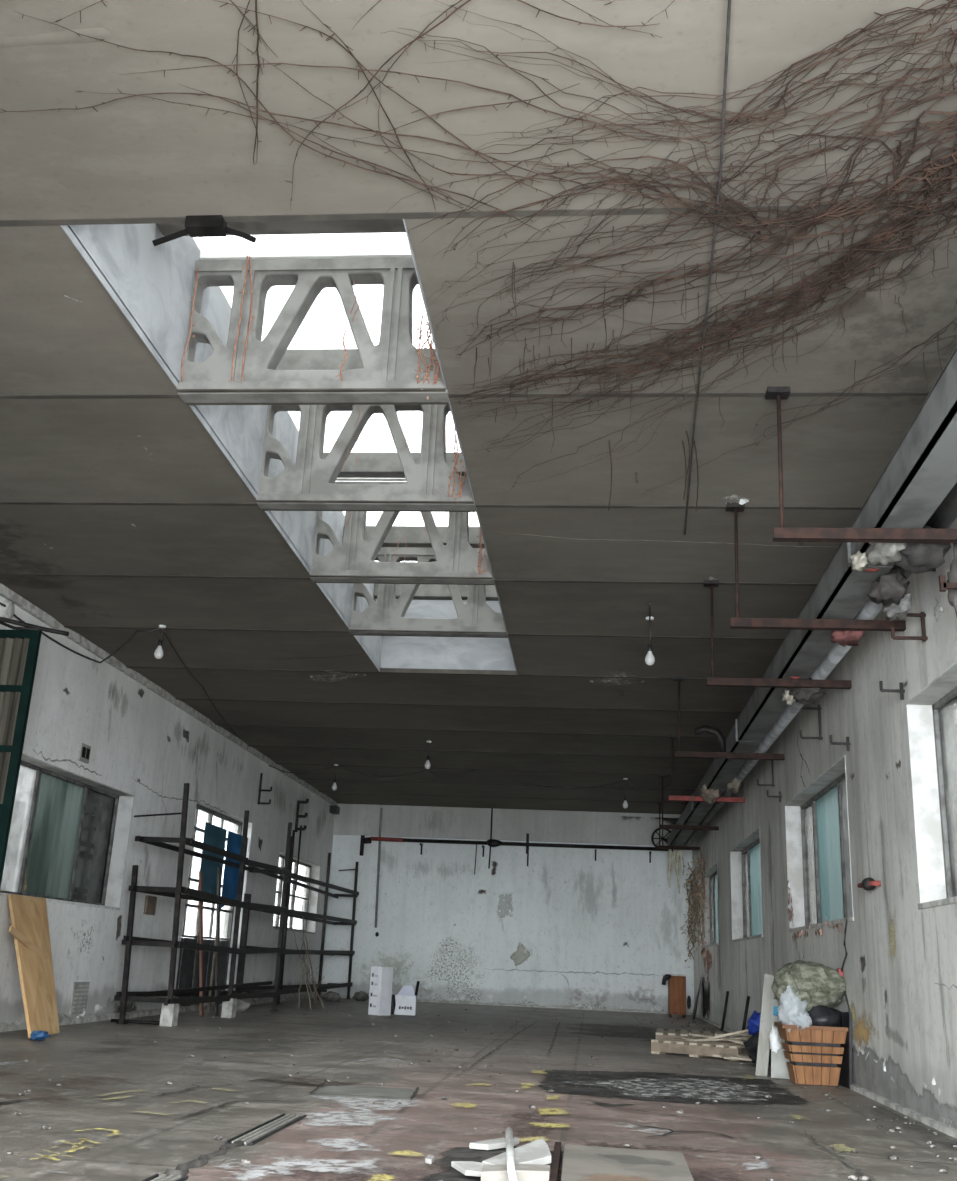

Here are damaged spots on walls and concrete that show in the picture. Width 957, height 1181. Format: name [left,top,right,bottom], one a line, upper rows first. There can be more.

peeling [511,942,533,966]
crack [0,1097,43,1105]